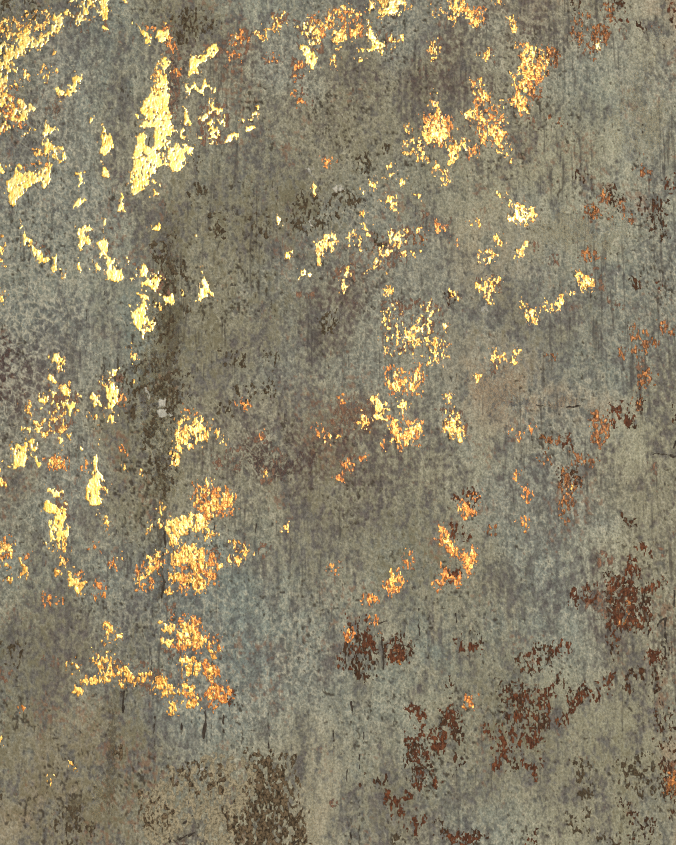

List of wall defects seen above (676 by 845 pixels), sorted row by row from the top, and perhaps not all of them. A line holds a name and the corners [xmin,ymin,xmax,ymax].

rust [569,0,660,62]
rust [508,313,676,526]
rust [336,587,415,683]
rust [359,675,489,845]
rust [483,541,676,820]
rust [615,795,661,845]